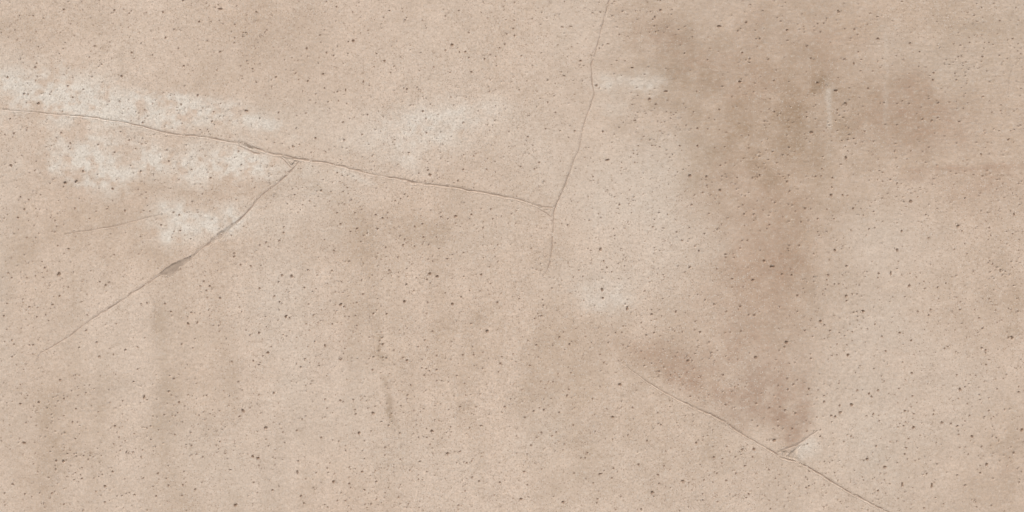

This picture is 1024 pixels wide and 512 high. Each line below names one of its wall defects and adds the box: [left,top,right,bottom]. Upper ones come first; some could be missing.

leakage [0,39,523,257]
crack [4,0,611,362]
leakage [579,36,698,122]
leakage [728,68,871,171]
crack [618,361,891,512]
leakage [791,434,823,463]